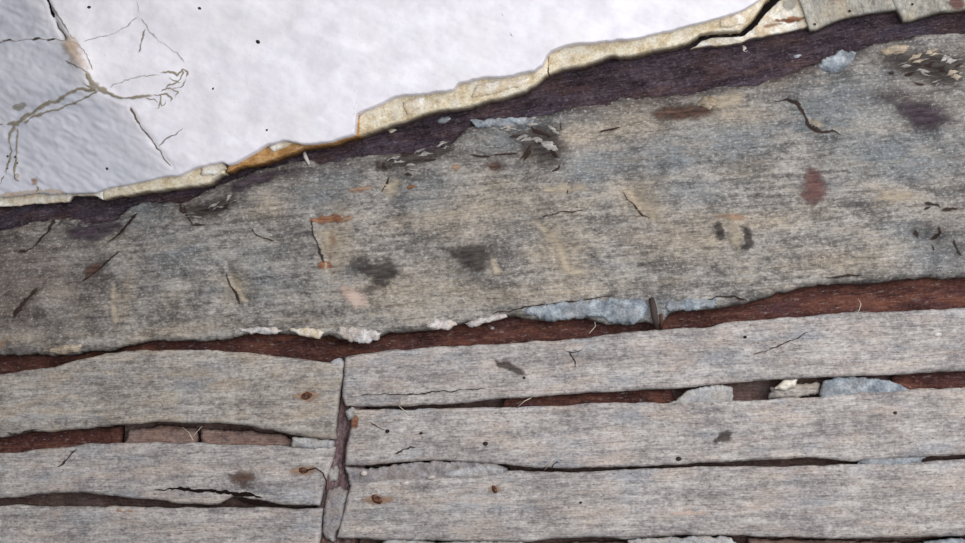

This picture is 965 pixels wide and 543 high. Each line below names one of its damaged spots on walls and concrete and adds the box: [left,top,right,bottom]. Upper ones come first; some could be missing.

crack [698,0,778,41]
crack [0,0,189,182]
flaking render [0,0,770,207]
spalling [622,190,665,222]
corrosion [310,214,352,269]
crack [155,486,268,505]